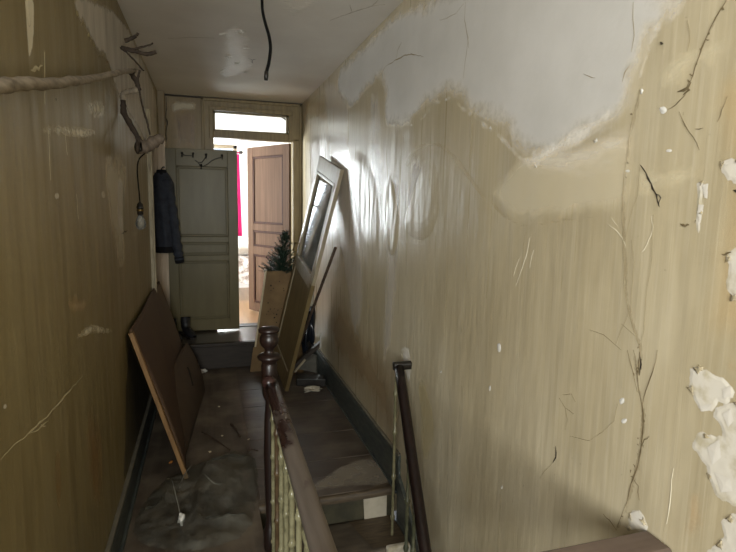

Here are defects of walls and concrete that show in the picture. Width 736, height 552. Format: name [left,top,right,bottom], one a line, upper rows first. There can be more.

peeling [338,0,664,147]
crack [670,1,727,148]
peeling [681,180,708,233]
spalling [720,158,736,192]
crack [599,95,657,530]
spalling [687,365,736,552]